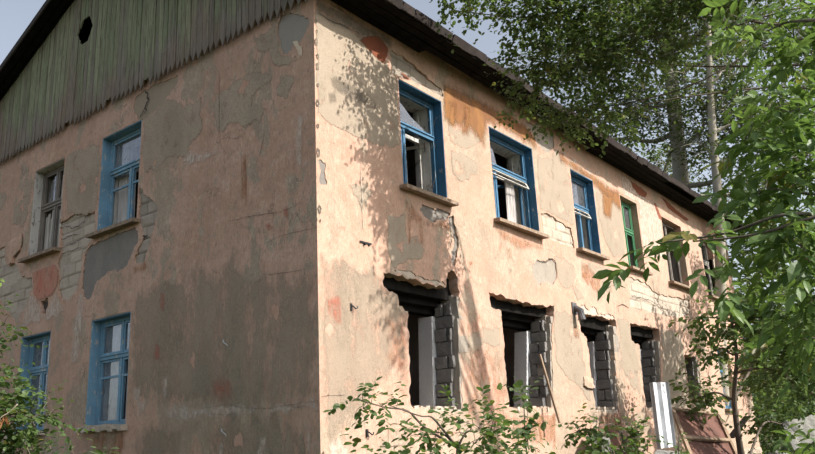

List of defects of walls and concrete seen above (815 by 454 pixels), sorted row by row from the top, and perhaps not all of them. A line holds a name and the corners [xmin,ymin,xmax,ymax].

spalling [0,213,138,323]